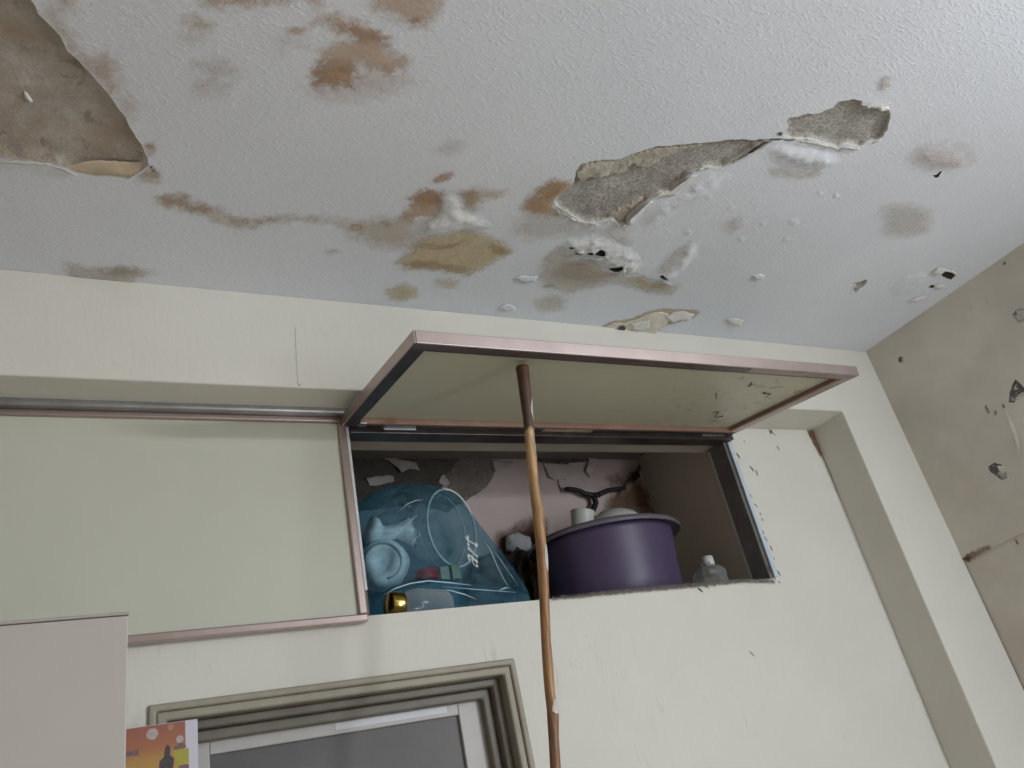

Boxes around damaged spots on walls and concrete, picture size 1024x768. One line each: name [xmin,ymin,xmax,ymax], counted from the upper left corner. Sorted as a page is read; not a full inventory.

leakage [315,17,407,87]
flaking render [0,0,149,179]
spalling [555,99,891,226]
leakage [526,181,570,216]
leakage [351,191,510,286]
leakage [543,252,675,293]
peeling [605,311,694,334]
peeling [352,458,514,512]
peeling [534,435,598,491]